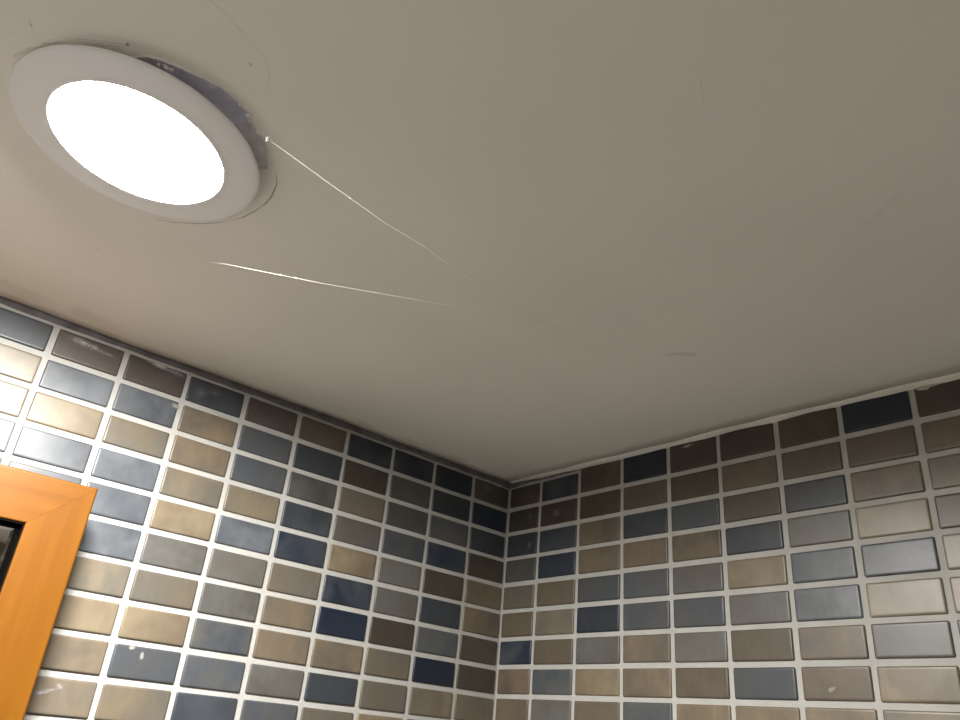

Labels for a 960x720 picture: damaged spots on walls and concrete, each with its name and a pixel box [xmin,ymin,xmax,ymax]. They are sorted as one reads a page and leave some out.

crack [156,173,277,224]